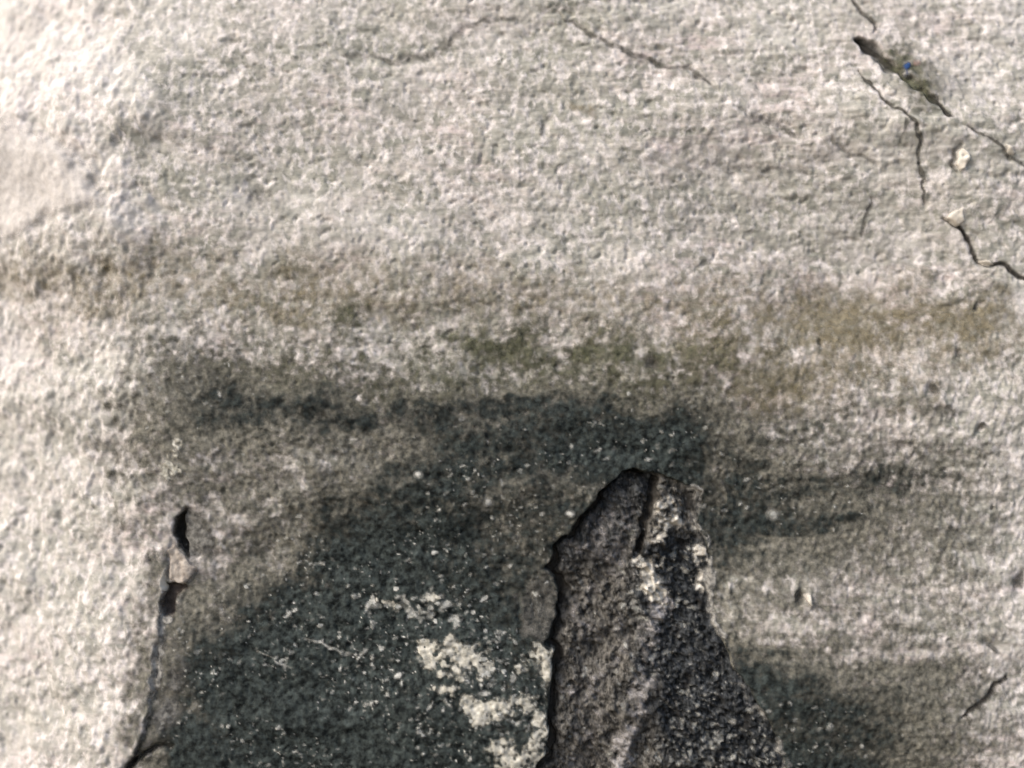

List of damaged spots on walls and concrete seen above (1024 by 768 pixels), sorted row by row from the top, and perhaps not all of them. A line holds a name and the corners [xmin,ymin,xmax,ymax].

crack [852,1,1024,201]
leakage [231,269,353,328]
crack [944,207,1024,280]
crack [126,505,213,768]
leakage [97,335,1024,768]
spalling [521,468,791,768]